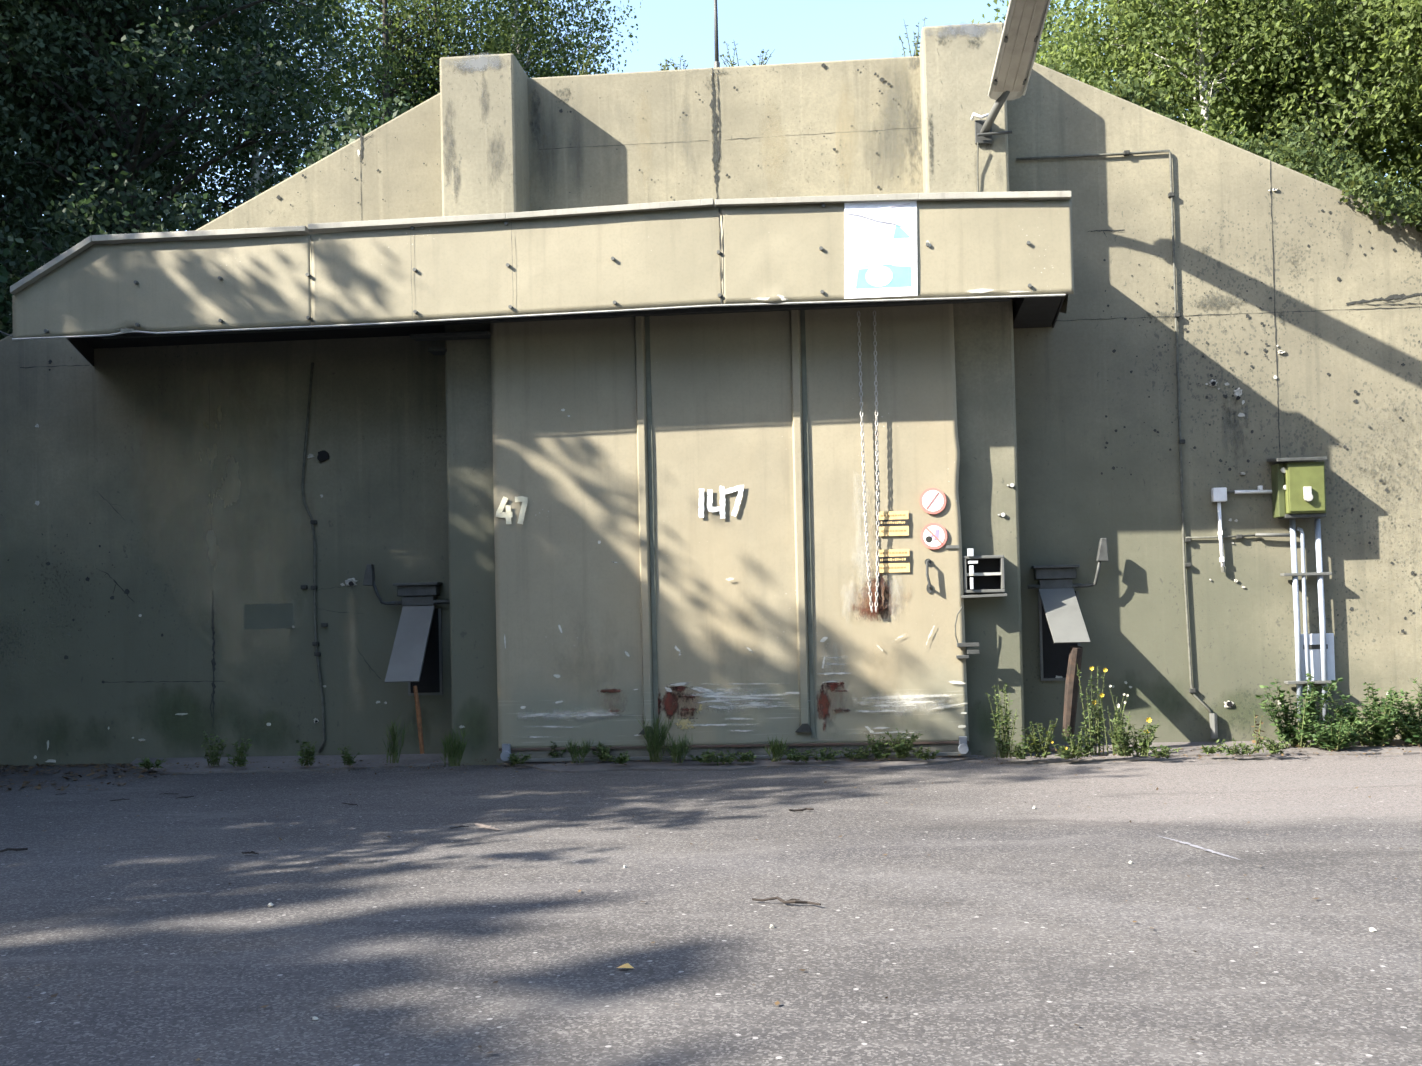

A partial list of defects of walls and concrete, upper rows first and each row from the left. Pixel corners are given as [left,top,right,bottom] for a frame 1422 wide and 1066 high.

damp [463,55,498,71]
corrosion [853,572,894,617]
peeling [820,637,848,682]
corrosion [658,686,695,719]
peeling [665,682,810,732]
corrosion [817,682,848,730]
peeling [859,681,967,738]